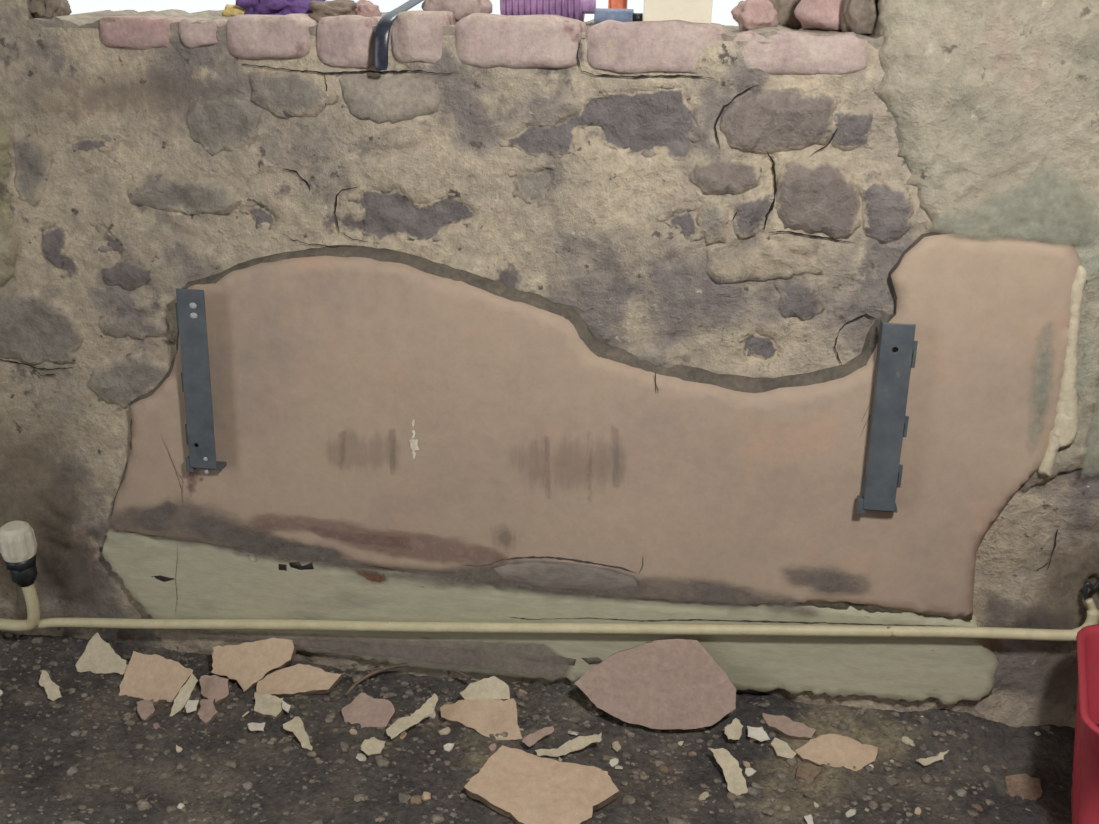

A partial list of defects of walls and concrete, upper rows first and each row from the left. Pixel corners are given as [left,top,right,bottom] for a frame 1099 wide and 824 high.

flaking render [186,71,441,156]
flaking render [13,134,52,207]
flaking render [41,224,73,269]
flaking render [90,221,151,291]
flaking render [127,174,278,230]
spalling [346,187,474,245]
spalling [497,84,914,321]
spalling [739,331,780,367]
damp [0,444,95,607]
damp [108,503,814,613]
damp [788,570,862,593]
damp [1015,553,1099,681]